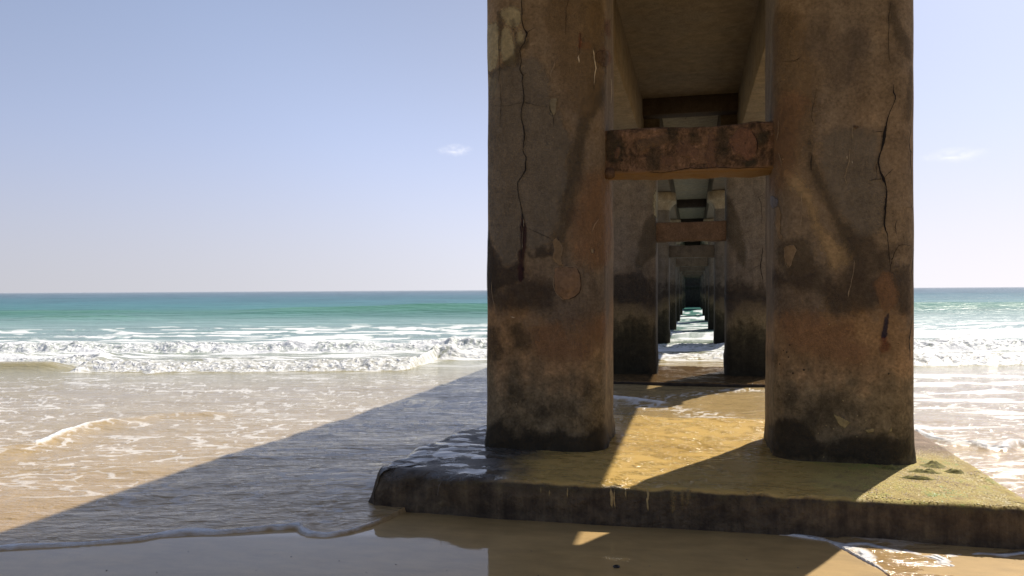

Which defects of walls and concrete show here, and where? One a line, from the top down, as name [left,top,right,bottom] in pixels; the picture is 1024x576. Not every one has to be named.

crack [495,0,554,258]
peeling [487,7,581,299]
crack [870,86,914,273]